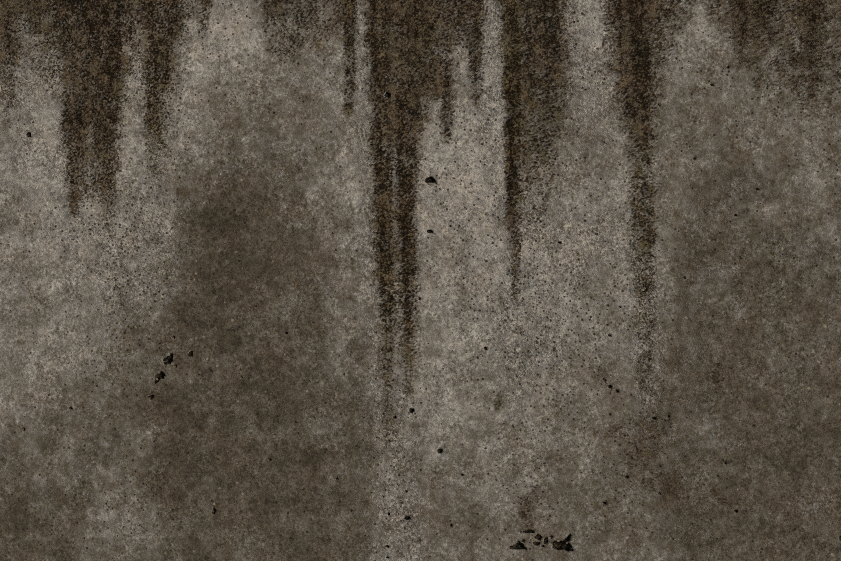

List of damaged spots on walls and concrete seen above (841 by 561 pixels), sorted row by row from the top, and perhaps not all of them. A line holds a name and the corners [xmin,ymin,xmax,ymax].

leakage [196,0,213,38]
leakage [706,0,841,111]
leakage [653,159,841,561]
leakage [0,426,123,561]